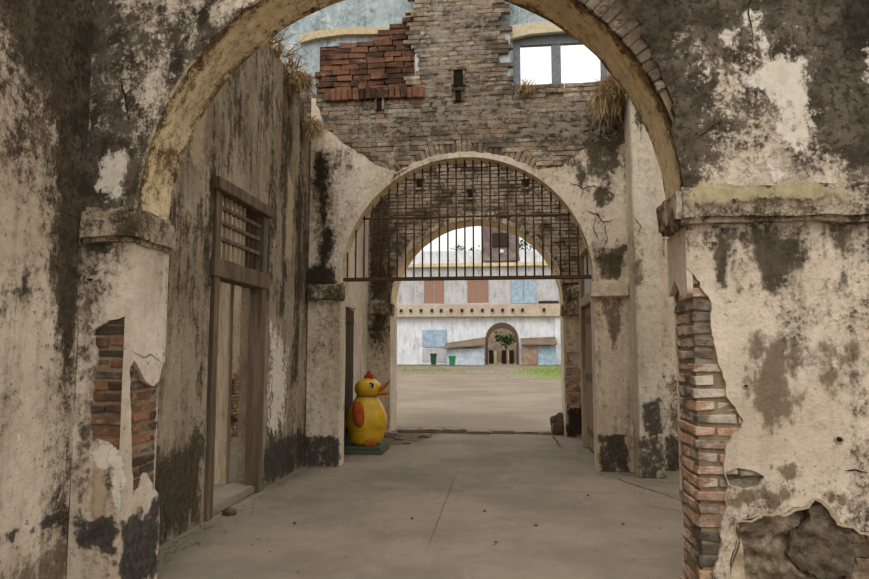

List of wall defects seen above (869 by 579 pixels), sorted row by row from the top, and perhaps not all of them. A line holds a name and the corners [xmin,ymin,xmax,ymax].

crack [120,77,133,120]
damp [165,34,189,83]
damp [840,0,869,59]
damp [7,0,92,392]
crack [571,183,612,247]
spalling [31,318,162,579]
damp [602,379,681,511]
spalling [665,276,762,579]
spalling [728,498,869,579]